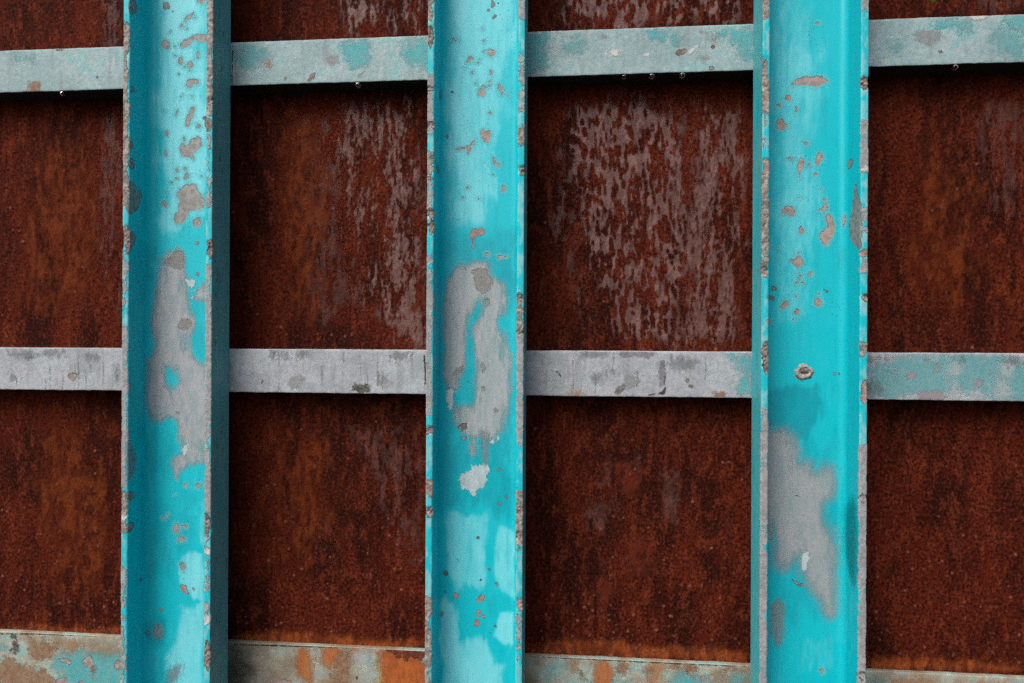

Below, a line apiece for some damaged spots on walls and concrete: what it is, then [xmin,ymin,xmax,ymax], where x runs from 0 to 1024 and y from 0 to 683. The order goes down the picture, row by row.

peeling [161,0,215,227]
corrosion [20,136,98,308]
spalling [760,172,812,320]
peeling [818,184,862,249]
peeling [146,247,206,488]
peeling [442,228,524,496]
corrosion [32,435,110,590]
peeling [768,429,837,617]
corrosion [0,622,121,683]
corrosion [233,630,425,683]
corrosion [531,638,748,683]
corrosion [870,656,1021,683]